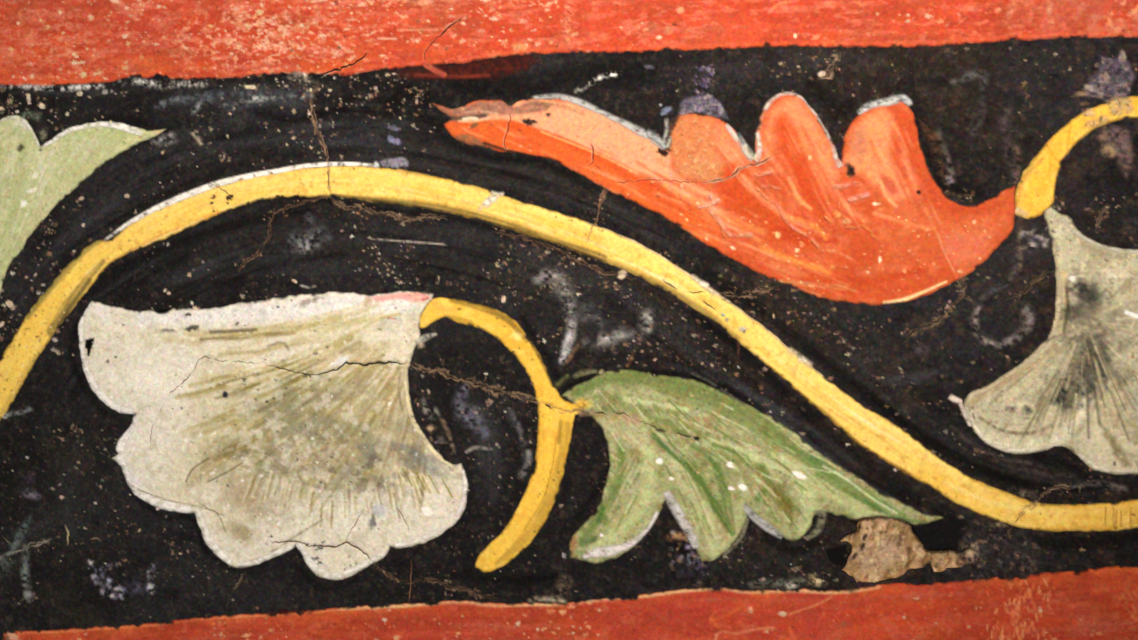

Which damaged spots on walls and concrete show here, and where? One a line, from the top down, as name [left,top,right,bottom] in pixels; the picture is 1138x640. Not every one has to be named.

crack [311,53,367,185]
crack [170,356,689,437]
crack [274,515,369,558]
flaking render [826,516,1036,583]